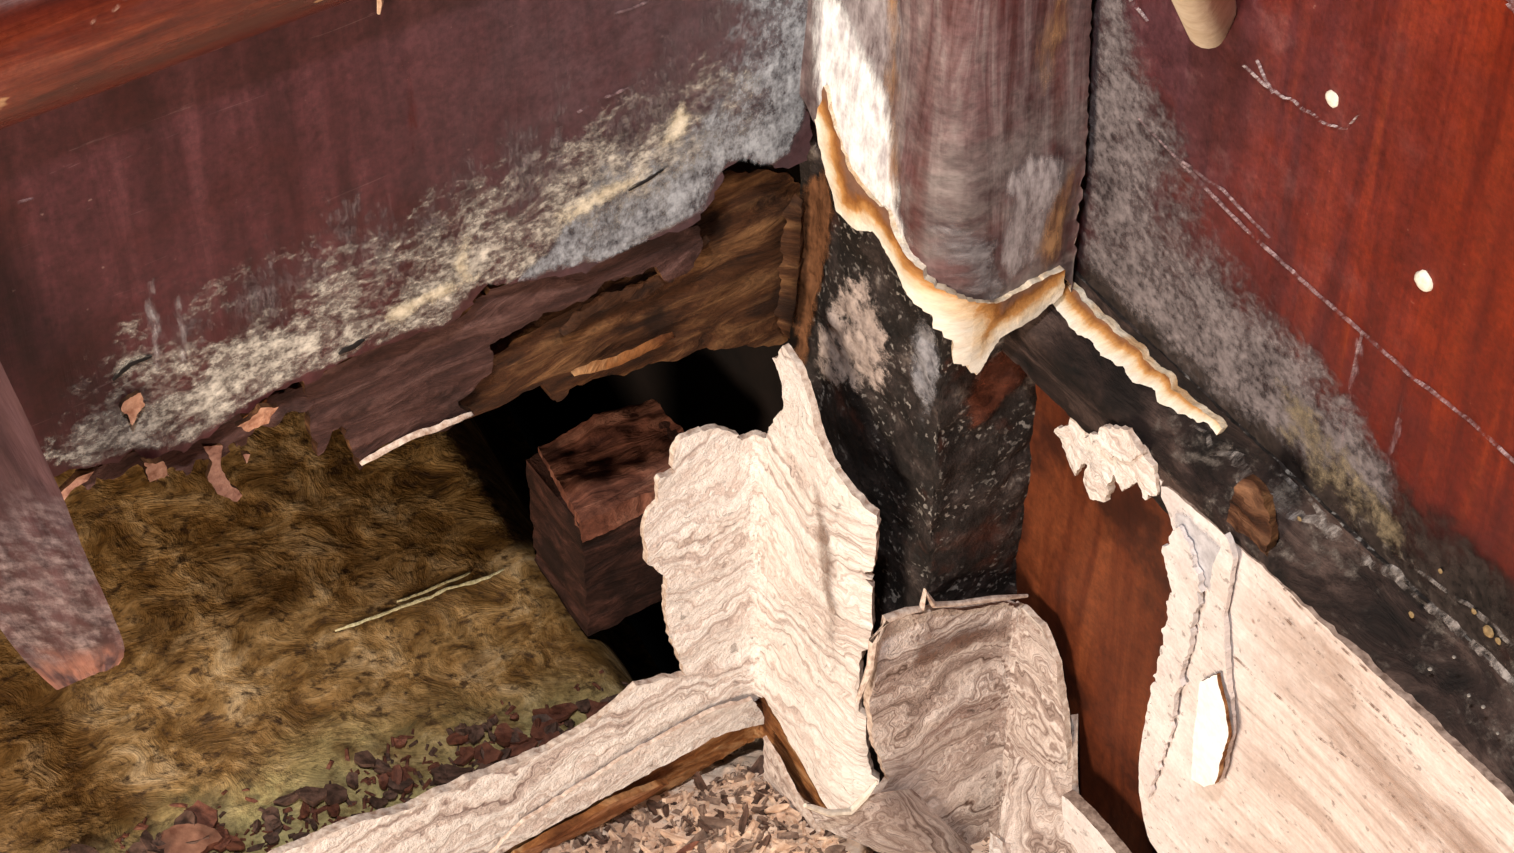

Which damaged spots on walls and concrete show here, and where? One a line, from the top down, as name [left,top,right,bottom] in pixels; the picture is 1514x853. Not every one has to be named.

leakage [44,0,903,463]
leakage [944,157,1062,301]
leakage [911,324,939,411]
leakage [1080,0,1514,679]
peeling [1054,417,1160,502]
leakage [819,517,834,611]